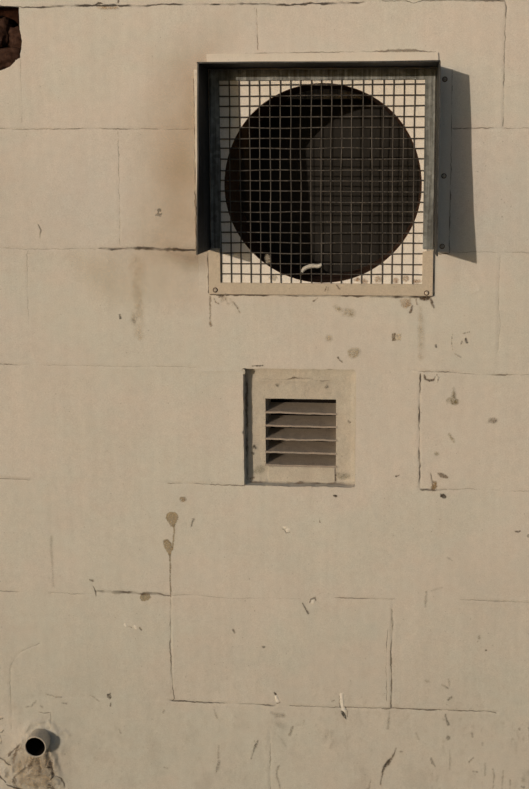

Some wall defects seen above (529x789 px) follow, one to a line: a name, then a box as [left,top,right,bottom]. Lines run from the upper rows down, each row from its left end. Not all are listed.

damp [163,512,178,595]